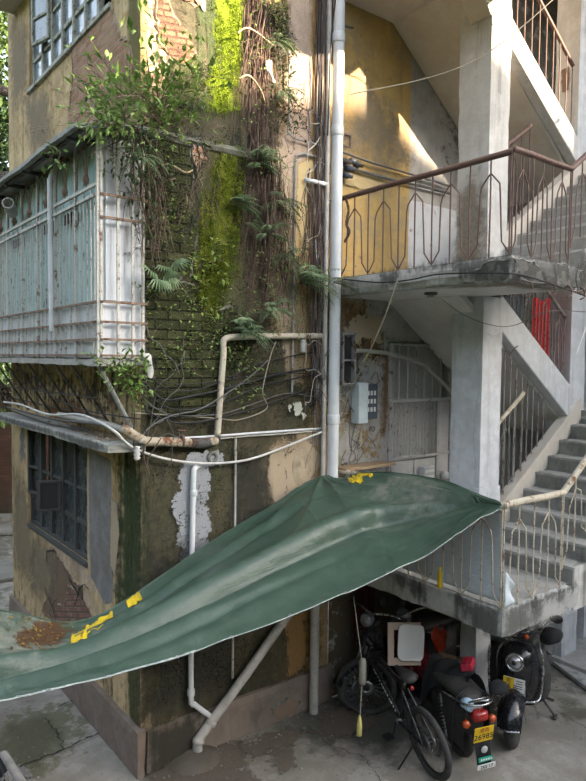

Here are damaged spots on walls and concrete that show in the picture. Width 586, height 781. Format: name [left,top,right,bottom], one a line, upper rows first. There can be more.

flaking render [68,4,133,123]
flaking render [153,0,207,110]
spalling [473,256,586,300]
corrosion [356,337,389,433]
flaking render [267,439,321,503]
flaking render [41,548,94,621]
water stain [395,573,426,601]
water stain [458,587,574,639]